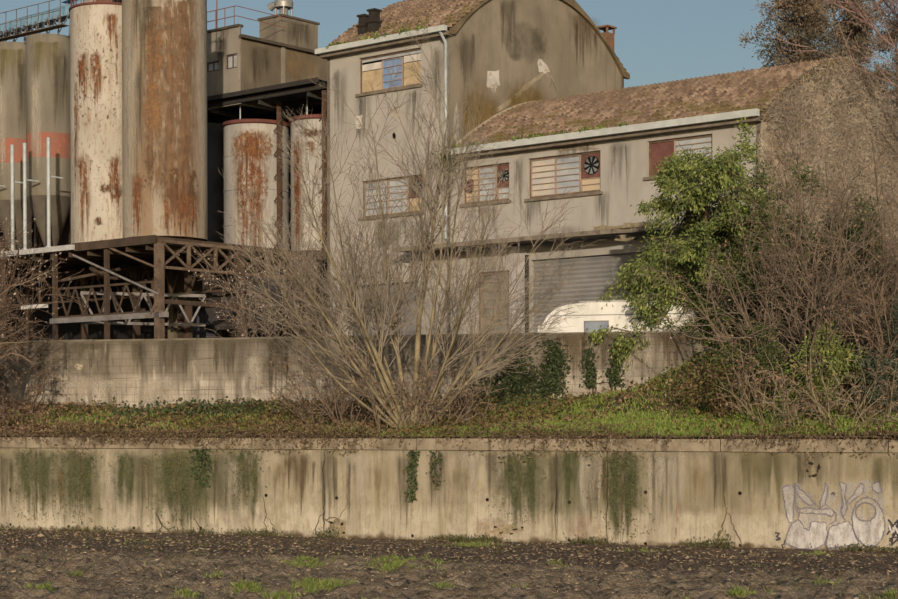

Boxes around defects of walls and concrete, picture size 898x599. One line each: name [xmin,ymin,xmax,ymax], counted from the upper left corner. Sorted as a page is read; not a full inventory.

corrosion [74,14,118,147]
corrosion [99,0,197,237]
corrosion [74,159,101,229]
corrosion [233,131,272,246]
crack [315,453,348,537]
crack [717,468,742,548]